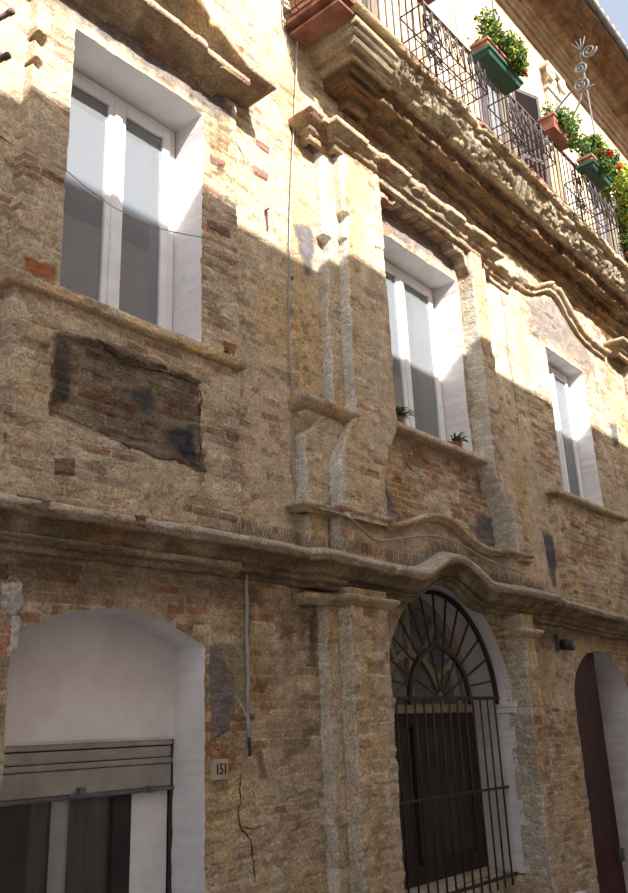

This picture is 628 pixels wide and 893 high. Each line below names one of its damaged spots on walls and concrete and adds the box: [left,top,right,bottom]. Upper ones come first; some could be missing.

spalling [53,457,76,477]
spalling [47,331,208,473]
crack [96,337,203,467]
crack [238,773,264,883]